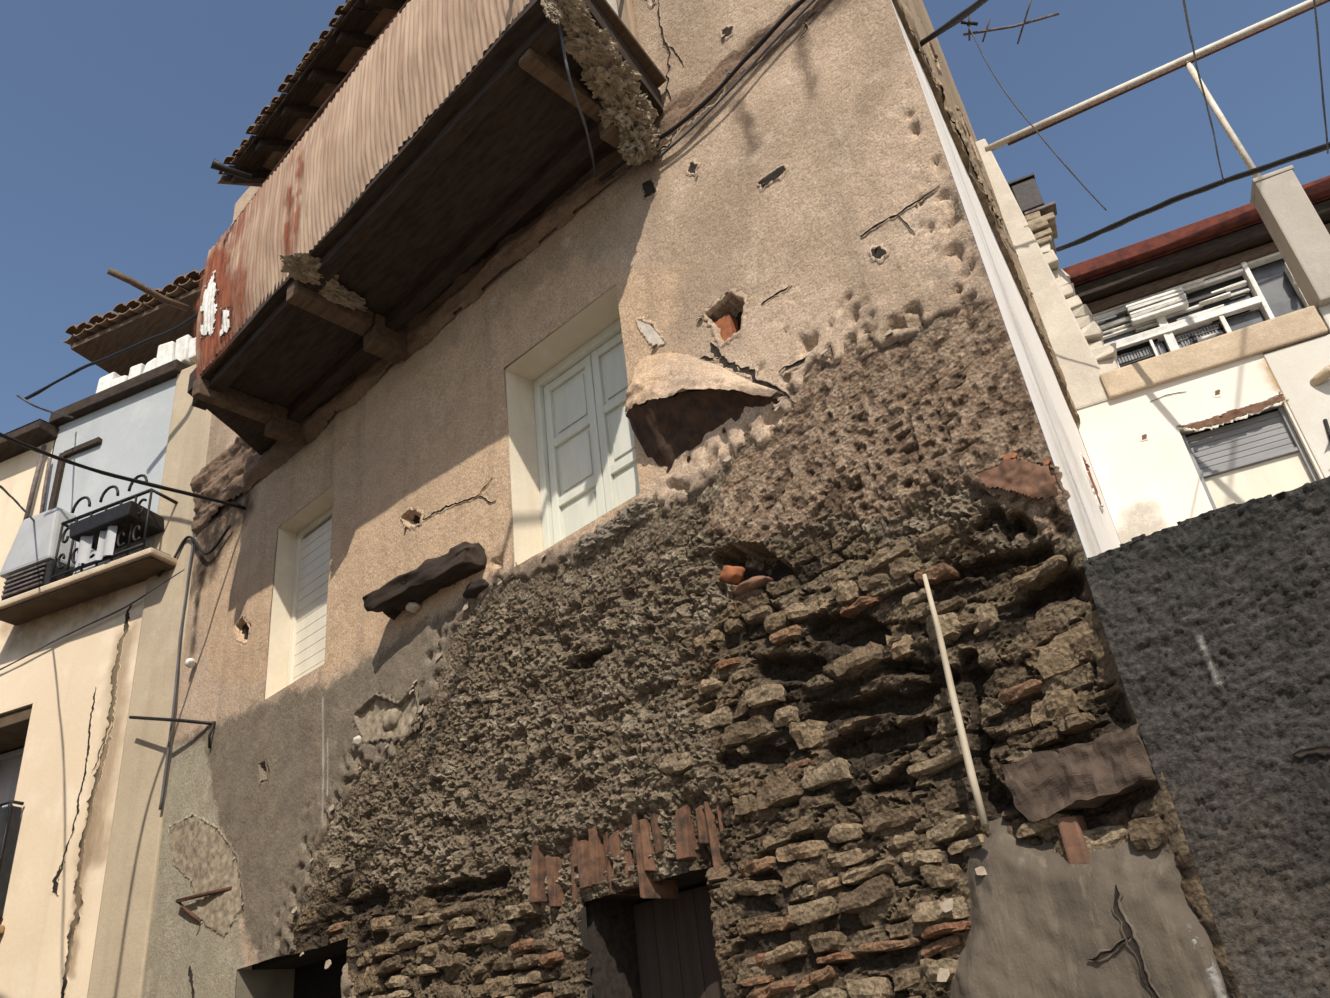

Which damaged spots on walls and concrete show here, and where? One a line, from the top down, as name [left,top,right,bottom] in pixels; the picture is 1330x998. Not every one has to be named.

spalling [541,0,661,201]
crack [655,1,763,157]
spalling [916,41,1003,230]
rust [284,154,302,254]
crack [860,185,940,238]
flaking render [954,190,975,241]
rust [196,249,246,364]
spalling [1176,388,1289,432]
crack [422,478,496,522]
flaking render [291,268,1242,998]
crack [49,604,133,998]
crack [1088,884,1162,998]